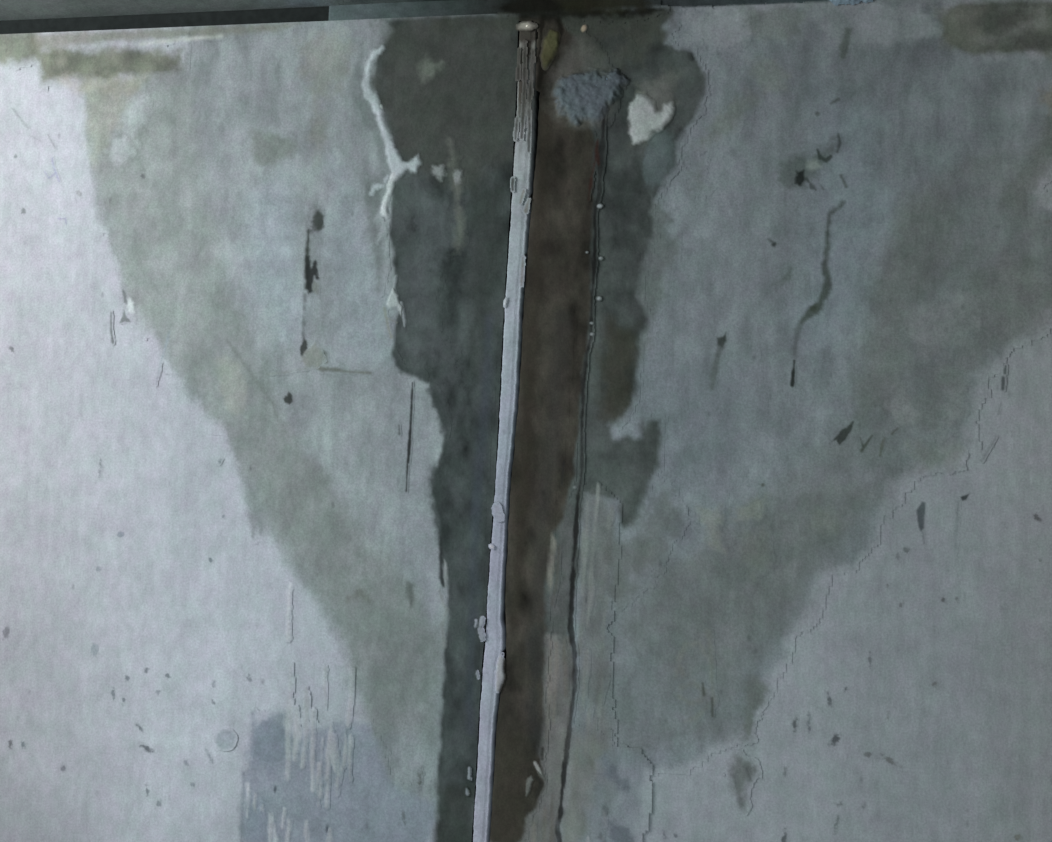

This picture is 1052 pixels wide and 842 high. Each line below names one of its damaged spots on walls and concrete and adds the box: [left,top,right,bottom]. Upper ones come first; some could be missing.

damp [0,19,443,792]
damp [245,0,449,9]
corrosion [490,20,626,842]
crack [549,115,607,842]
spalling [626,89,676,146]
damp [347,0,1052,842]